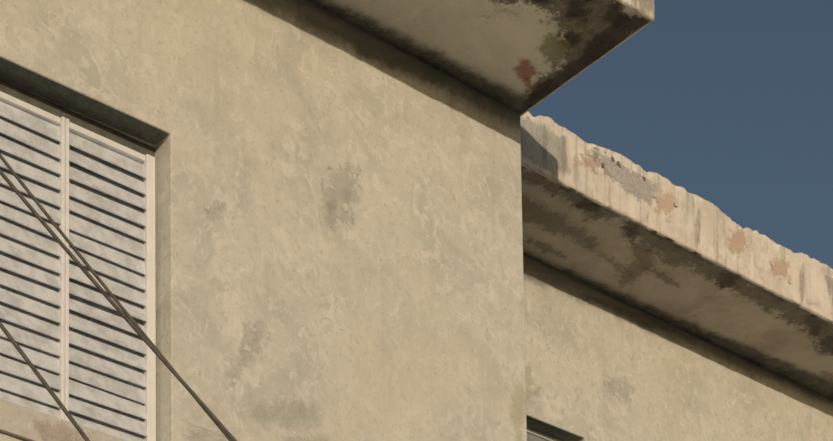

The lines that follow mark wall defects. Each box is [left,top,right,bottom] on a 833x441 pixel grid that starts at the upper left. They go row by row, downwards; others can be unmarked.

corrosion [513,61,536,92]
leakage [307,0,833,356]
spalling [580,146,679,222]
leakage [523,253,833,401]
leakage [526,416,583,441]